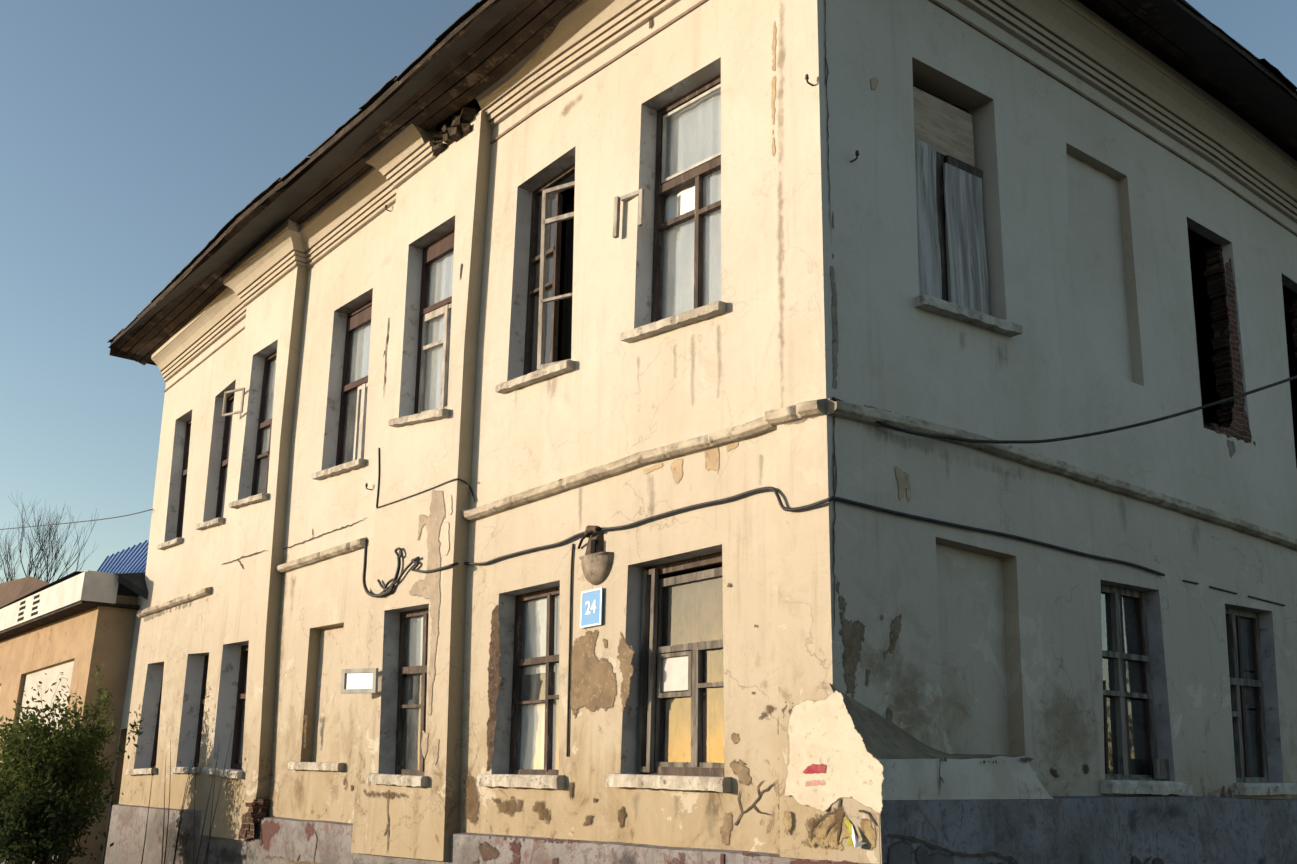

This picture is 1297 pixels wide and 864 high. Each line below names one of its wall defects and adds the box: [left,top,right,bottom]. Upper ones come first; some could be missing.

flaking render [409,490,452,715]
flaking render [569,629,634,718]
flaking render [881,615,902,658]
flaking render [464,605,597,864]
flaking render [783,578,884,864]
peeling [238,806,279,851]
crack [720,780,777,864]